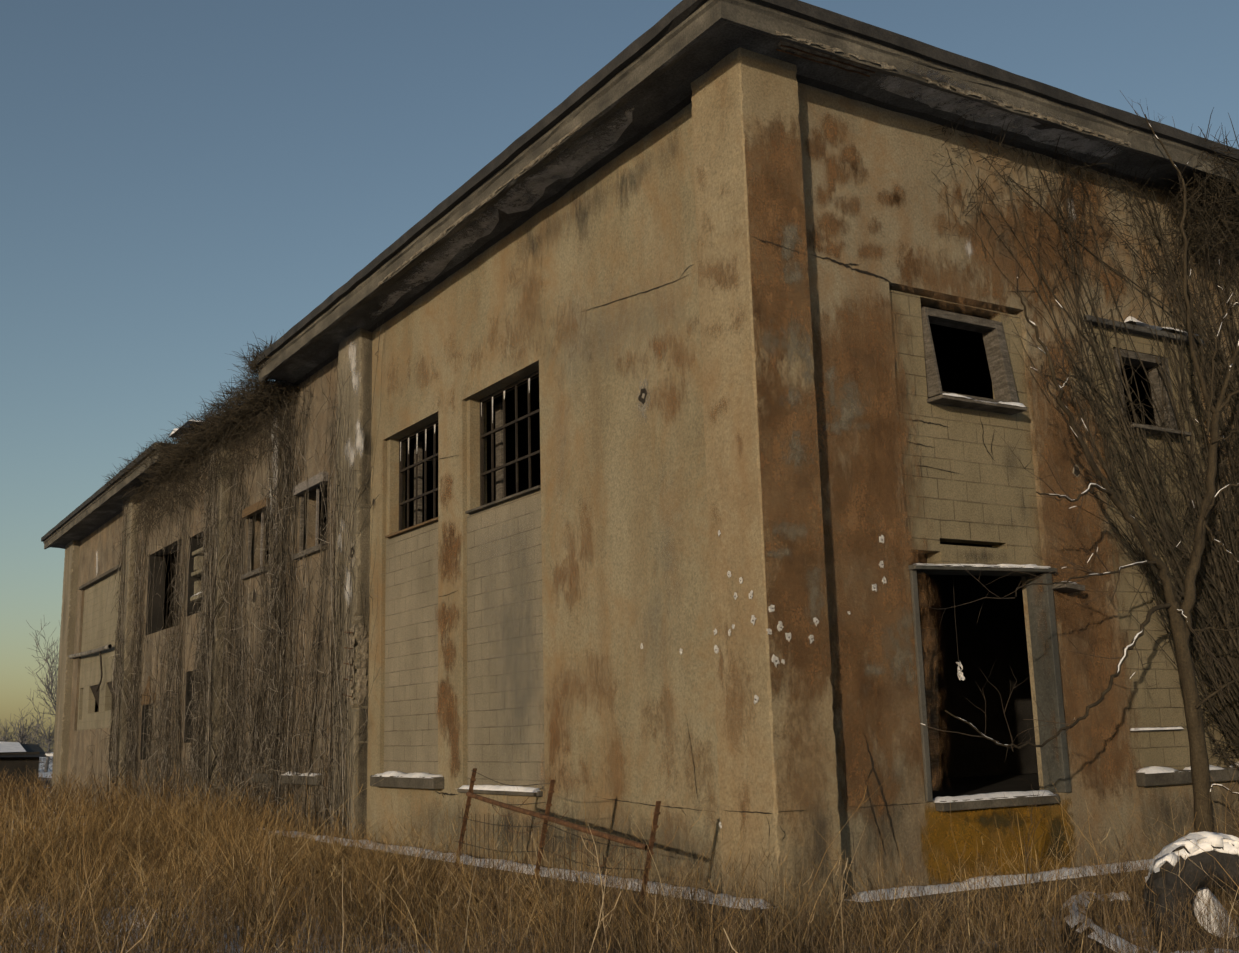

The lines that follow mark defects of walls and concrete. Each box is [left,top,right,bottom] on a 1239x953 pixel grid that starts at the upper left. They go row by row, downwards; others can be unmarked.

spalling [378,122,582,286]
crack [753,236,892,284]
crack [582,264,694,312]